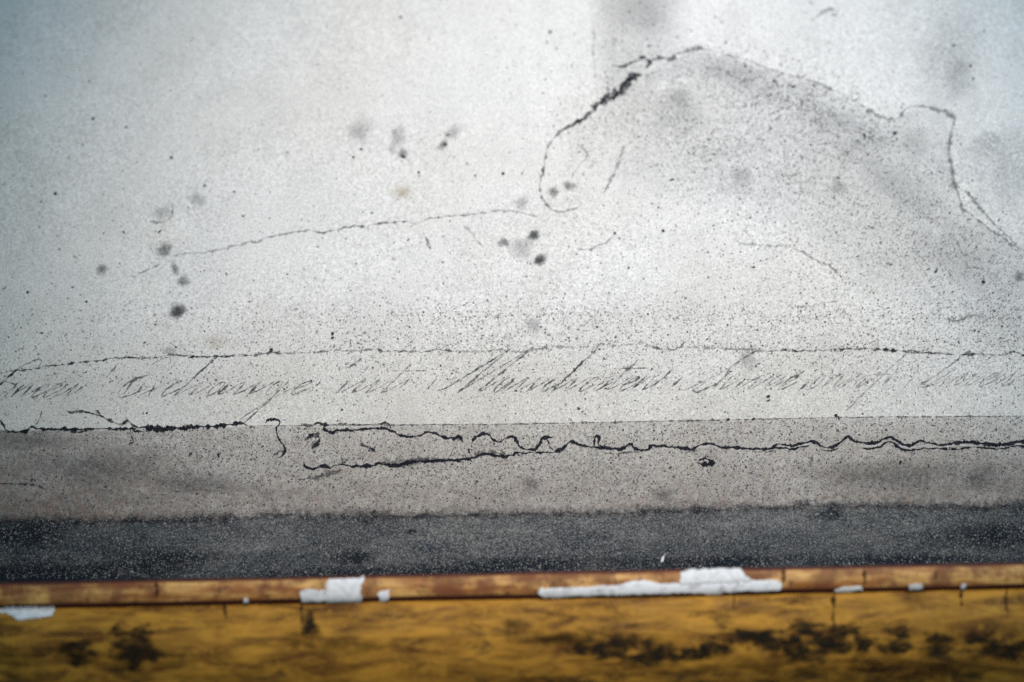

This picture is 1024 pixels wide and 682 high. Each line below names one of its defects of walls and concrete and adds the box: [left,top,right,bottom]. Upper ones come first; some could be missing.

crack [539,47,702,212]
crack [0,410,1024,480]